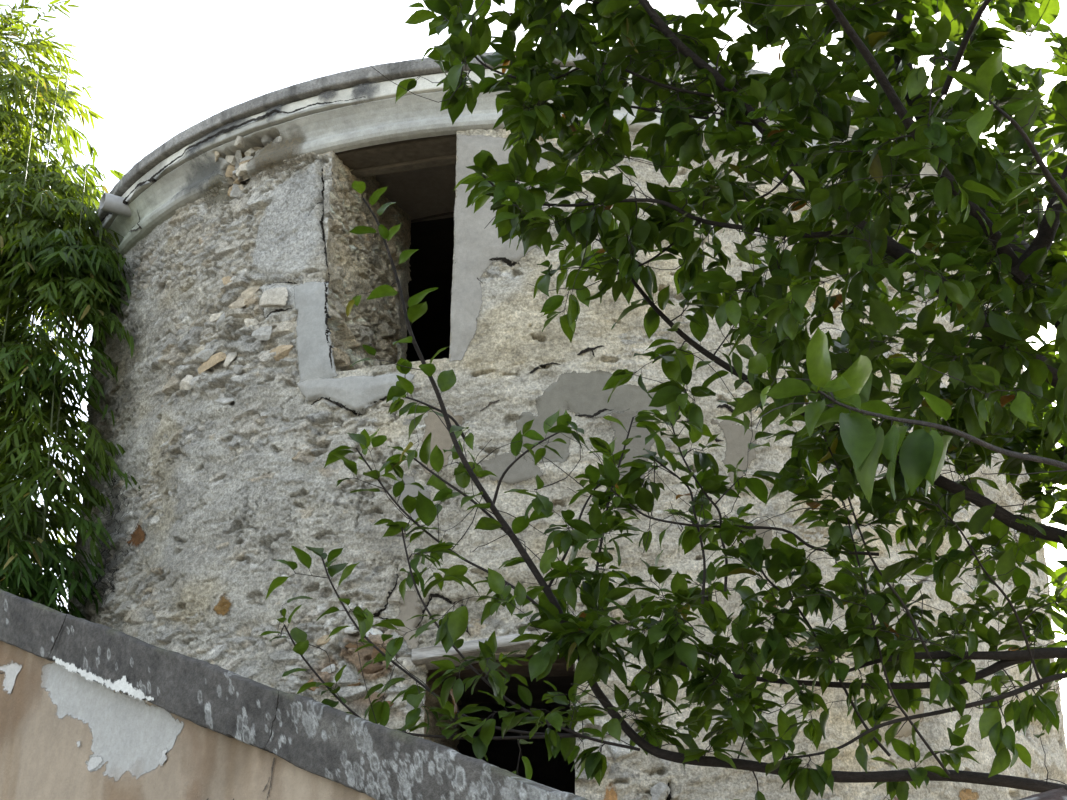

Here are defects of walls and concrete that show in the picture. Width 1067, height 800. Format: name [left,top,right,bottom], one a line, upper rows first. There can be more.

peeling [41,662,184,781]